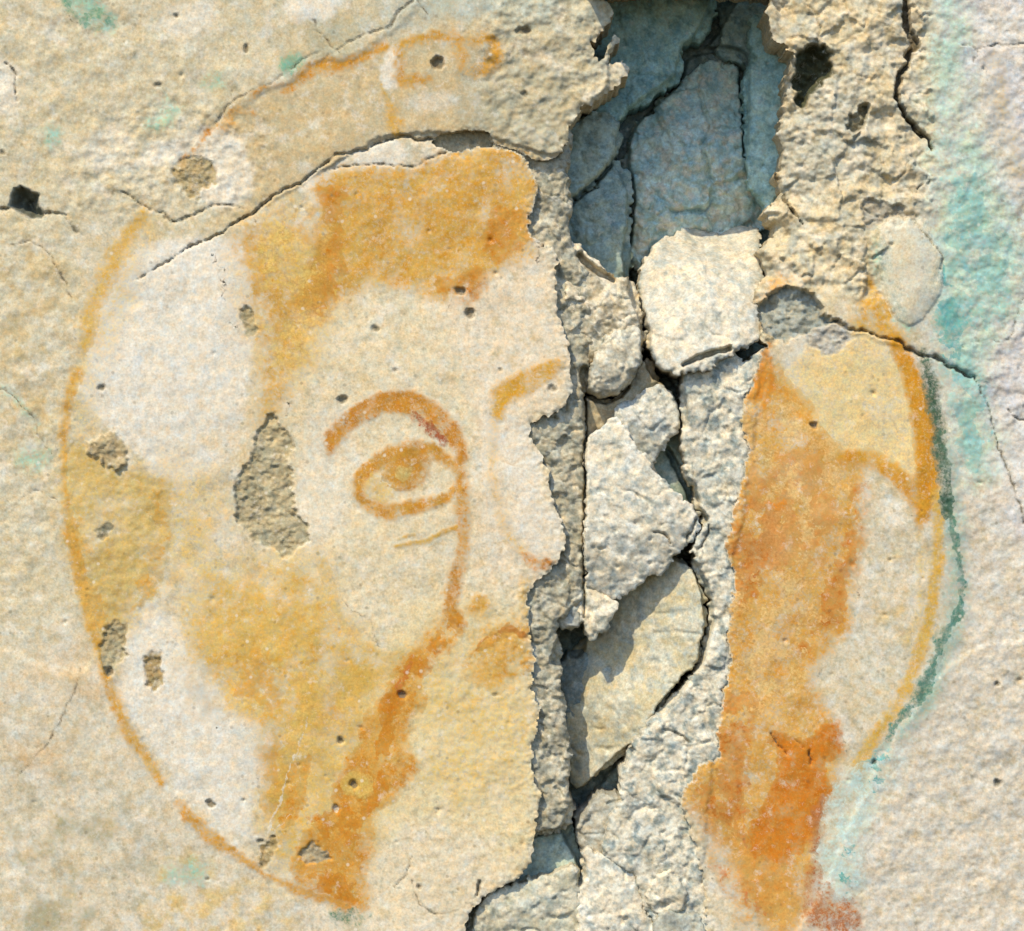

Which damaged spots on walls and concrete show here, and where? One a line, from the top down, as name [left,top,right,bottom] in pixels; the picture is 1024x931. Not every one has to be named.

crack [616,17,744,161]
crack [893,0,932,151]
crack [962,42,1024,64]
crack [916,176,929,191]
crack [759,229,769,245]
crack [834,297,1024,525]
flaking render [85,430,129,470]
flaking render [232,412,311,559]
crack [120,128,764,929]
flaking render [100,620,129,677]
flaking render [142,649,166,693]